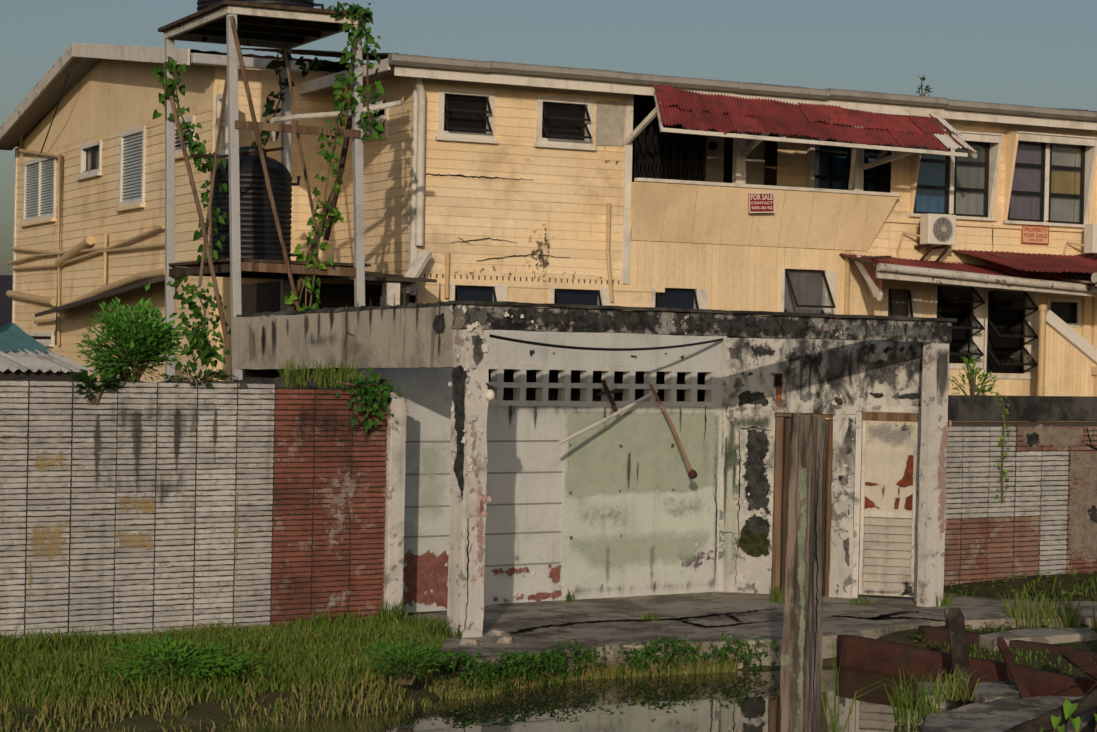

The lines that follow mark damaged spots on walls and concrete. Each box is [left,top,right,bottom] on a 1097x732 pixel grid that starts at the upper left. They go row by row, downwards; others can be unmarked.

crack [425,172,533,180]
crack [451,237,570,261]
mould [504,306,659,333]
water stain [249,320,288,355]
water stain [122,409,140,477]
water stain [174,409,197,468]
peeling [236,302,566,609]
spalling [1018,424,1084,449]
water stain [567,408,768,573]
crack [713,424,771,587]
spalling [1088,505,1097,523]
crack [510,609,774,634]